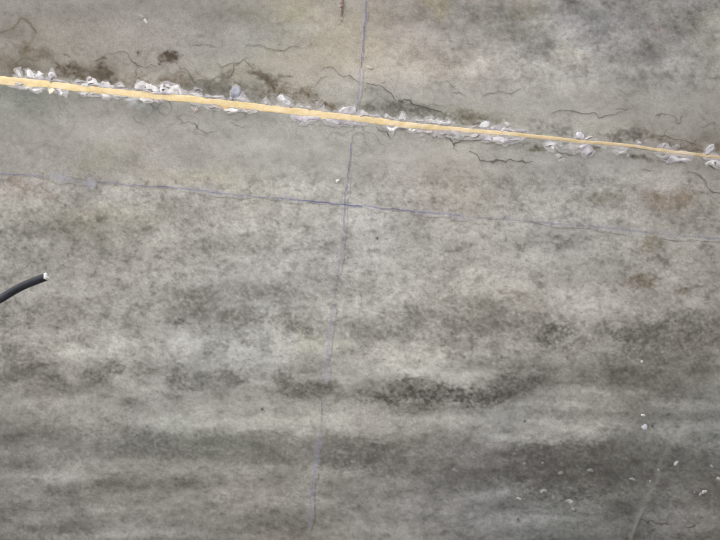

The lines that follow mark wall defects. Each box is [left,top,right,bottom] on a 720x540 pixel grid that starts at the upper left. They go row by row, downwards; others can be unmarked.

crack [111,50,157,79]
crack [219,44,299,75]
crack [176,115,245,134]
crack [316,66,523,117]
damp [351,80,509,128]
crack [436,136,533,164]
crack [552,108,629,119]
damp [511,116,720,165]
crack [655,112,716,144]
crack [640,160,720,194]
damp [0,280,720,417]